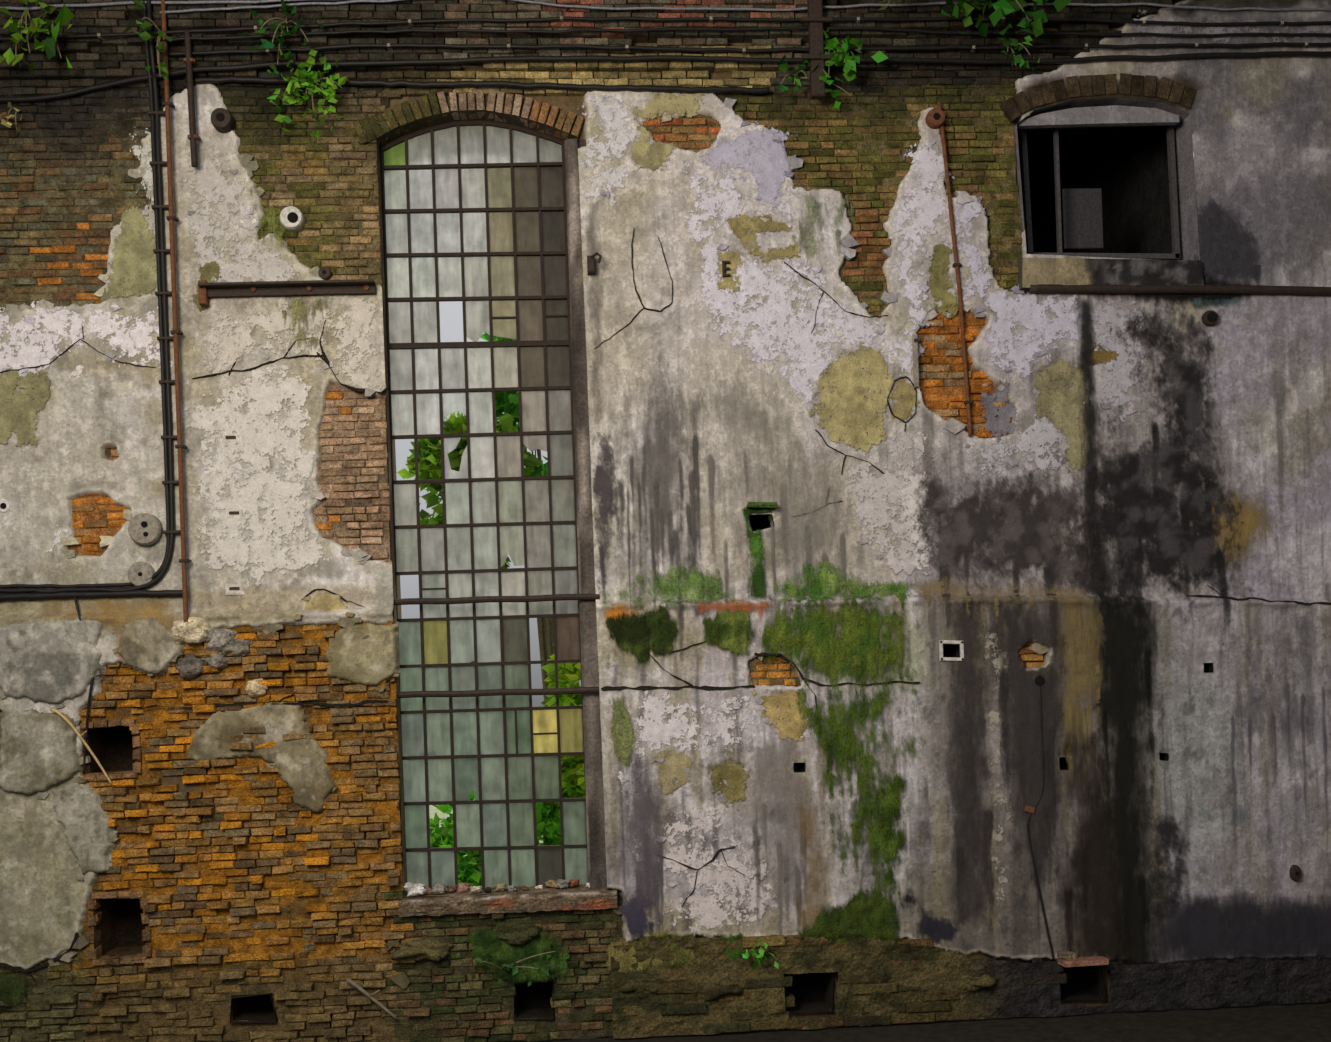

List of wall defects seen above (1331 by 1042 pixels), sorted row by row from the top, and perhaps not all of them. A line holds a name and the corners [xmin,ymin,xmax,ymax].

crack [0,326,156,373]
spalling [0,78,190,449]
spalling [179,69,401,589]
crack [192,320,389,394]
crack [594,229,673,349]
spalling [579,64,1148,585]
water stain [593,388,729,646]
water stain [830,199,1331,970]
spalling [0,617,638,1042]
water stain [611,727,663,939]
crack [658,847,744,907]
water stain [803,662,877,802]